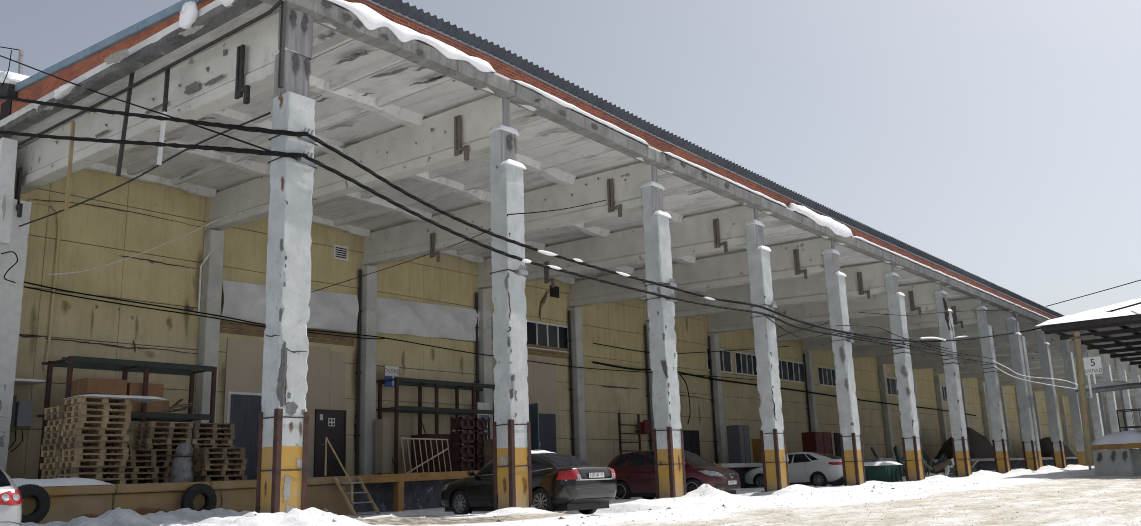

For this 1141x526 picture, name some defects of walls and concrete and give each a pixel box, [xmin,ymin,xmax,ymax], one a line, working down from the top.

spalling [276,340,305,416]
peeling [507,337,517,418]